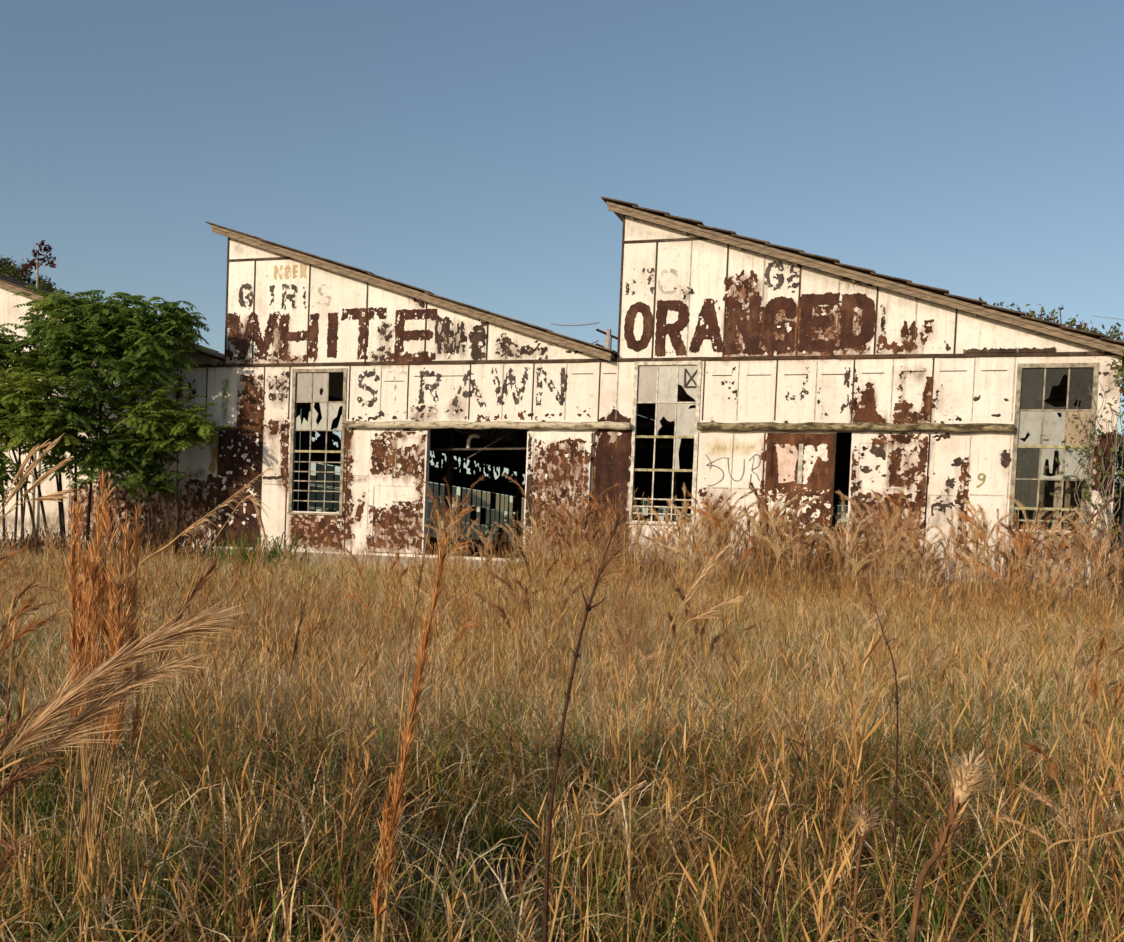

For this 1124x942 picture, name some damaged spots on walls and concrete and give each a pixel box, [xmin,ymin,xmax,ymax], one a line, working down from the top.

peeling [203,351,319,533]
peeling [340,388,562,551]
peeling [525,434,591,549]
corrosion [532,406,632,551]
peeling [767,443,831,556]
peeling [849,367,861,422]
peeling [850,442,886,493]
peeling [927,457,964,532]
peeling [930,384,962,441]